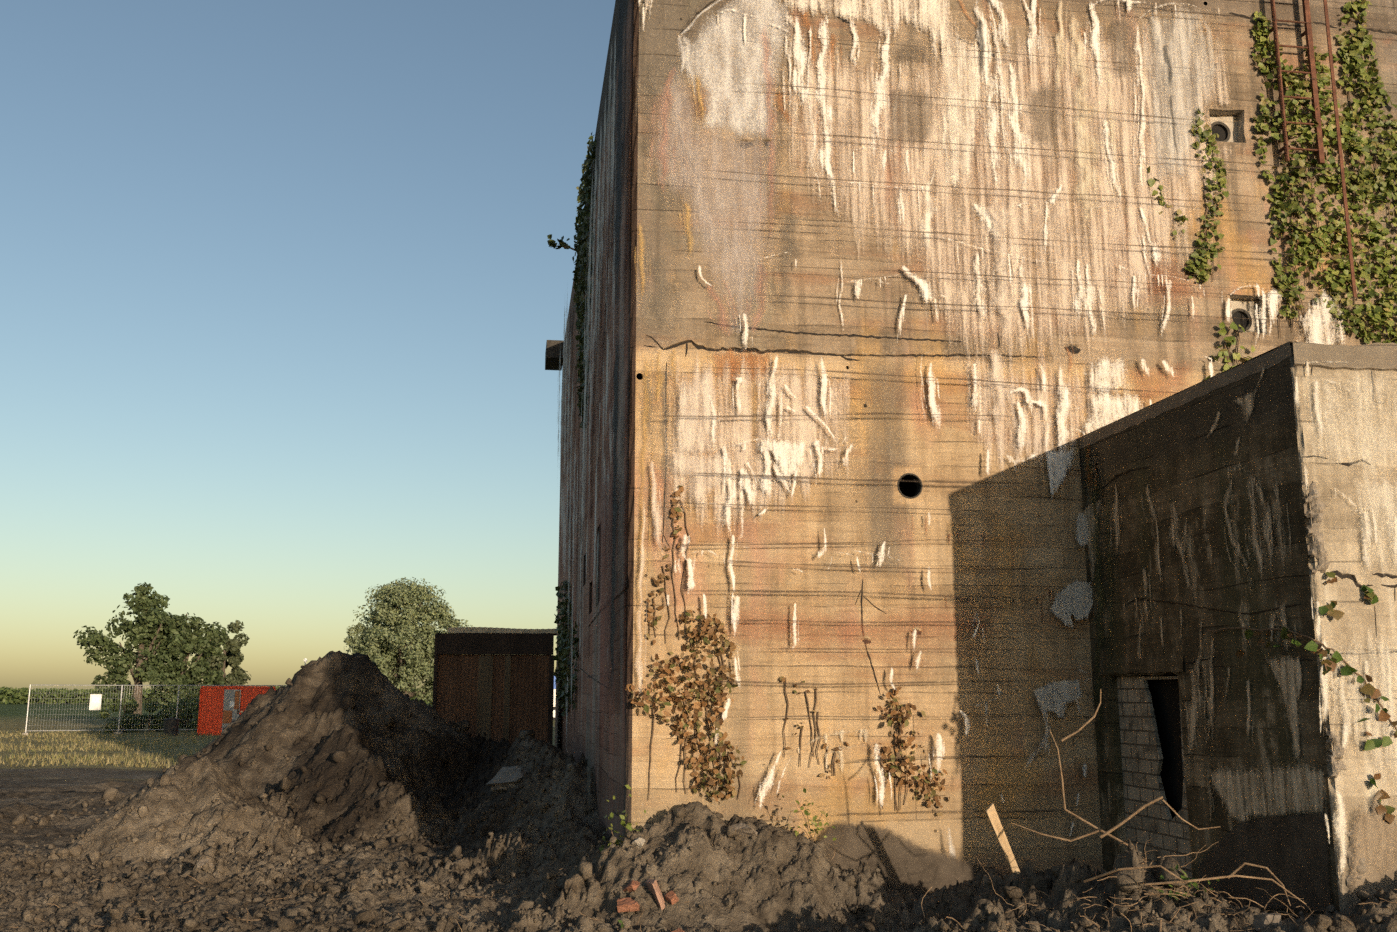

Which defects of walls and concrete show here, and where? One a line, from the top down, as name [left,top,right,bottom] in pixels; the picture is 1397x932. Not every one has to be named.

crack [1229,12,1397,34]
crack [985,245,1040,264]
leakage [557,0,652,730]
crack [644,322,1044,547]
leakage [637,0,1231,762]
leakage [1295,362,1396,458]
leakage [1335,482,1397,562]
leakage [1311,598,1397,772]
leakage [824,730,892,804]
leakage [929,733,945,775]
leakage [1208,606,1346,870]